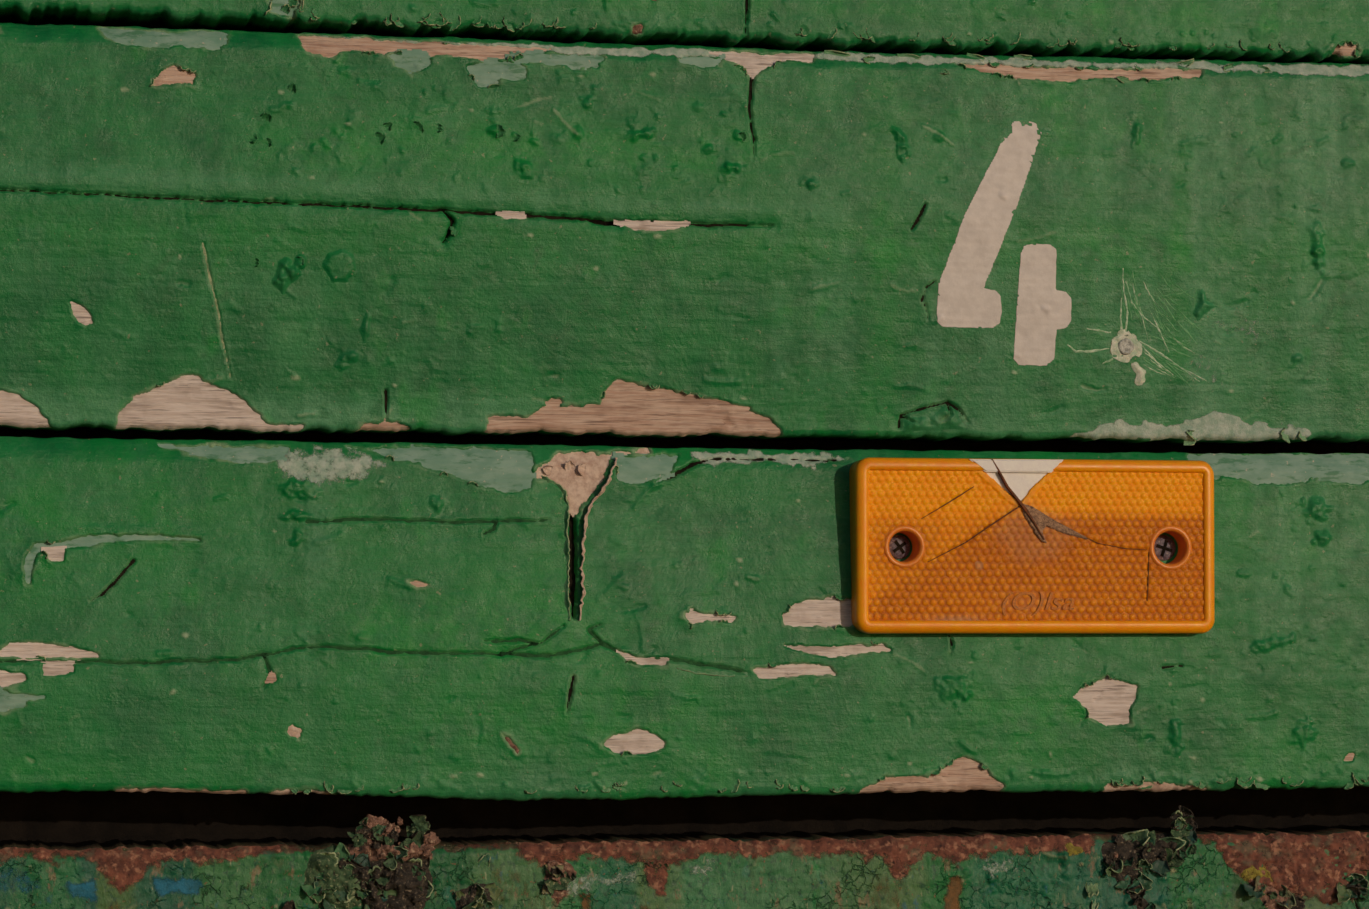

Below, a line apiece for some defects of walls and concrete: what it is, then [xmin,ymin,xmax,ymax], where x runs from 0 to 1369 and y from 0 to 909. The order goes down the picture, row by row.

peeling [264,0,1369,88]
crack [747,77,755,154]
peeling [1070,411,1369,485]
peeling [116,375,844,621]
crack [0,514,616,709]
crack [654,657,742,673]
peeling [616,594,891,679]
peeling [830,757,1004,794]
corrosion [0,845,282,909]
corrosion [282,814,441,909]
corrosion [447,882,501,909]
corrosion [491,806,1369,909]